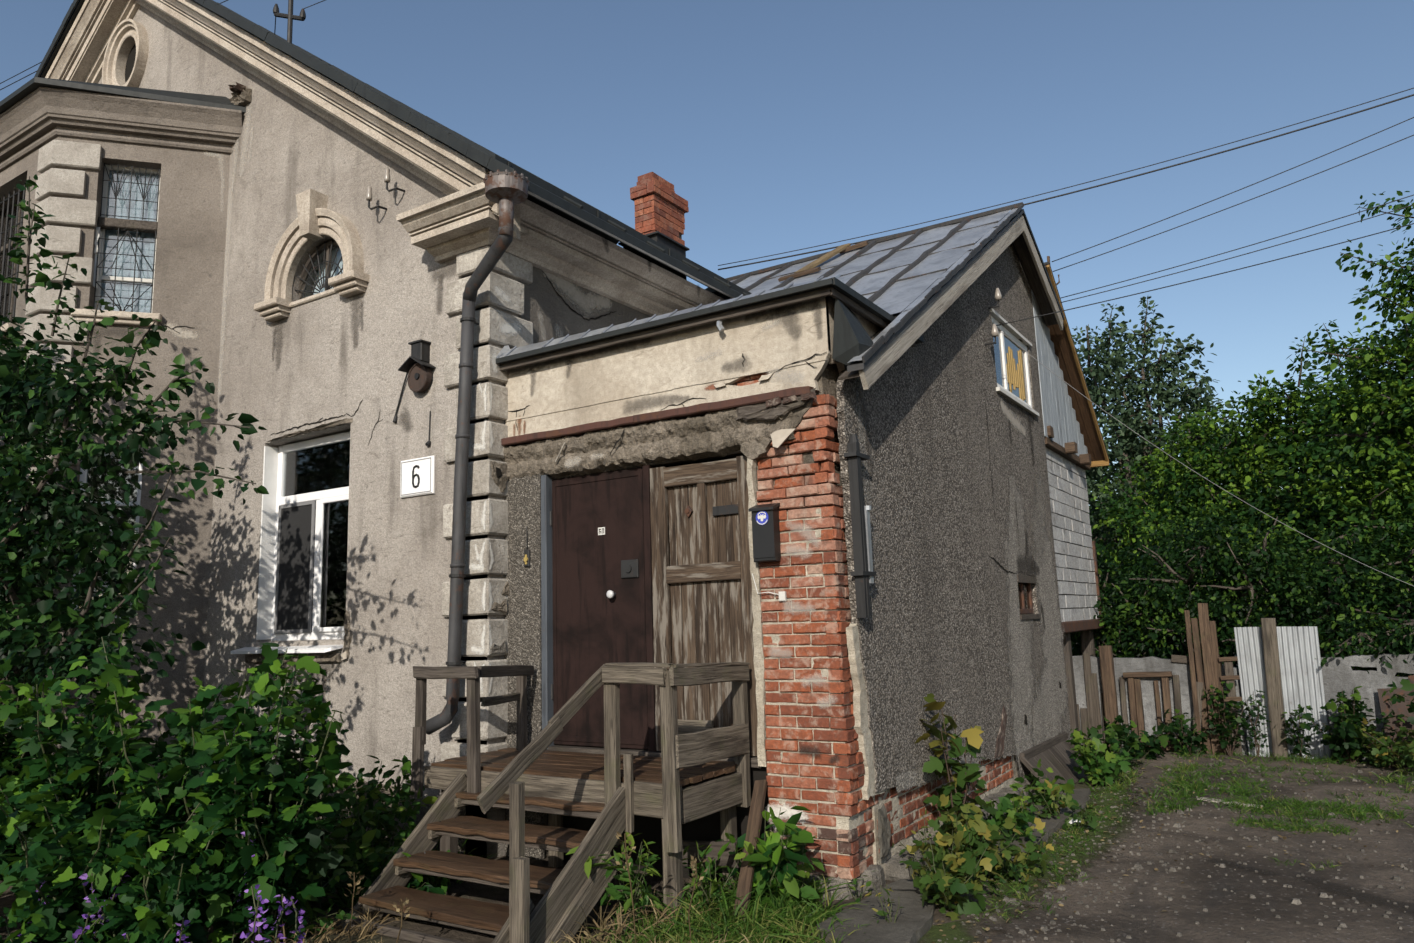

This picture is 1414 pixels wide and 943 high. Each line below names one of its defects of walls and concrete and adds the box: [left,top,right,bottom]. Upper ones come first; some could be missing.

crack [742,352,826,373]
spalling [714,372,774,388]
crack [660,398,706,411]
spalling [736,388,817,455]
flaking render [857,397,873,559]